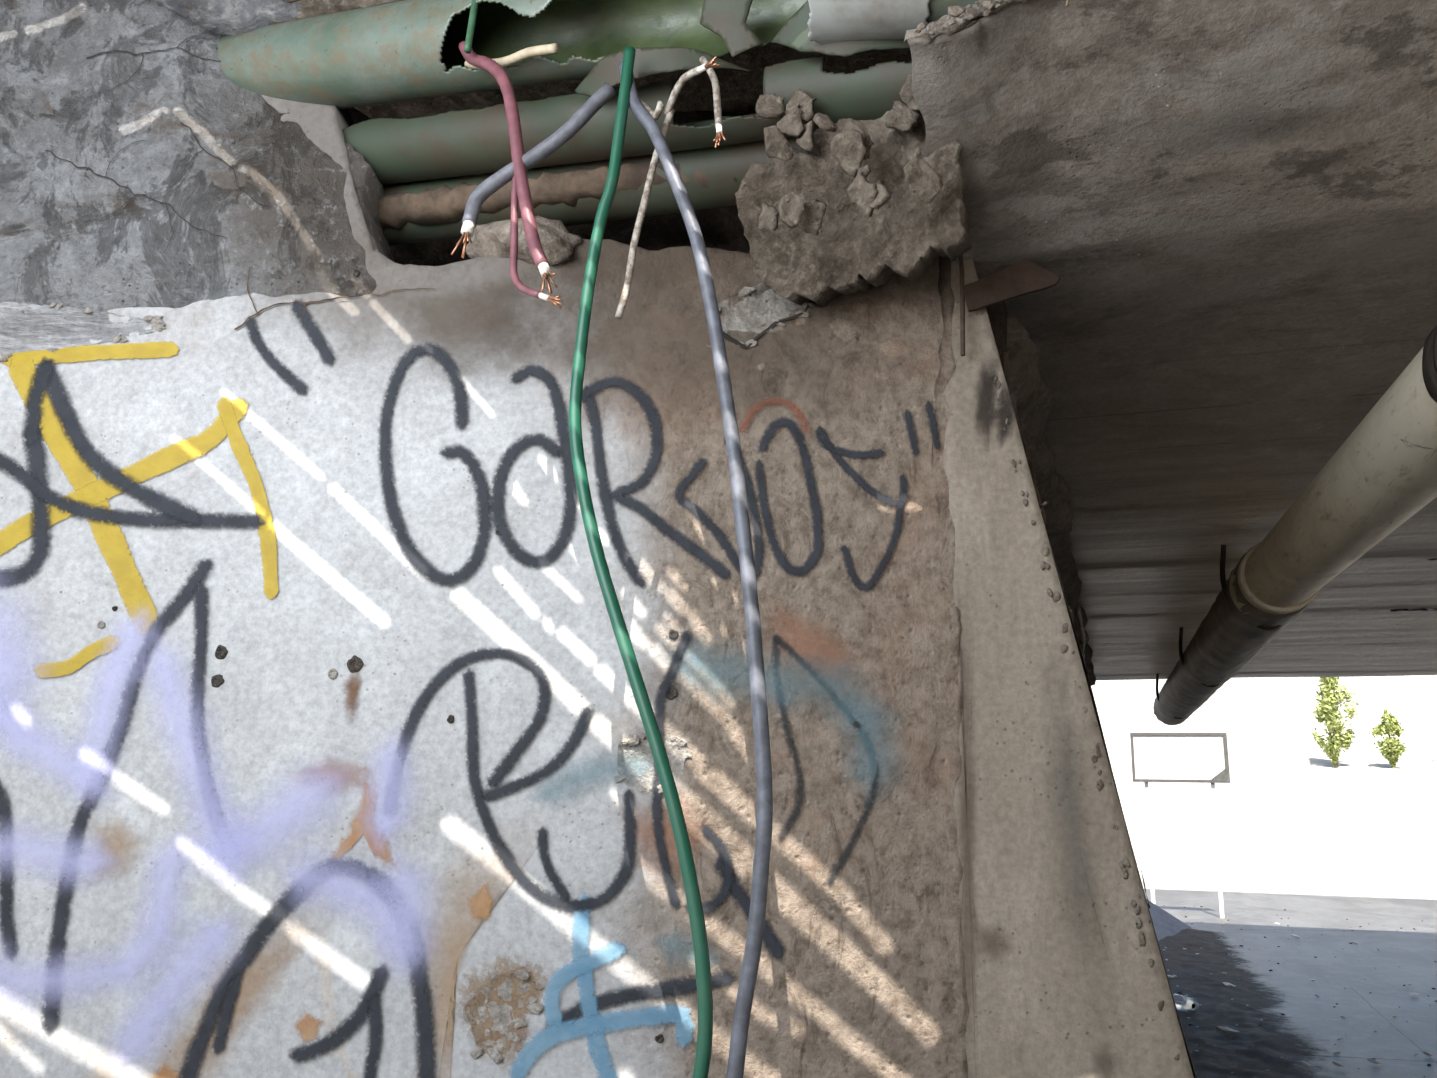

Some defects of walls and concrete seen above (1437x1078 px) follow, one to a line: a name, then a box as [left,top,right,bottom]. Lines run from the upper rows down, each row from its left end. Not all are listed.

spalling [926,0,1020,44]
spalling [718,73,972,356]